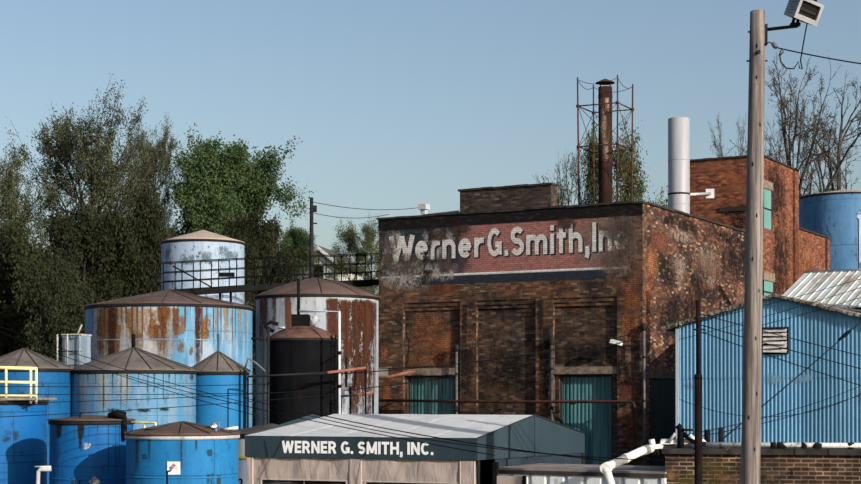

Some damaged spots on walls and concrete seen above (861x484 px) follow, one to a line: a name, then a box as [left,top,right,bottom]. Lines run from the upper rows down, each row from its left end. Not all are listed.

peeling [182,246,238,264]
peeling [384,241,427,275]
peeling [430,224,471,241]
corrosion [97,306,247,361]
corrosion [259,297,292,351]
corrosion [326,299,377,414]